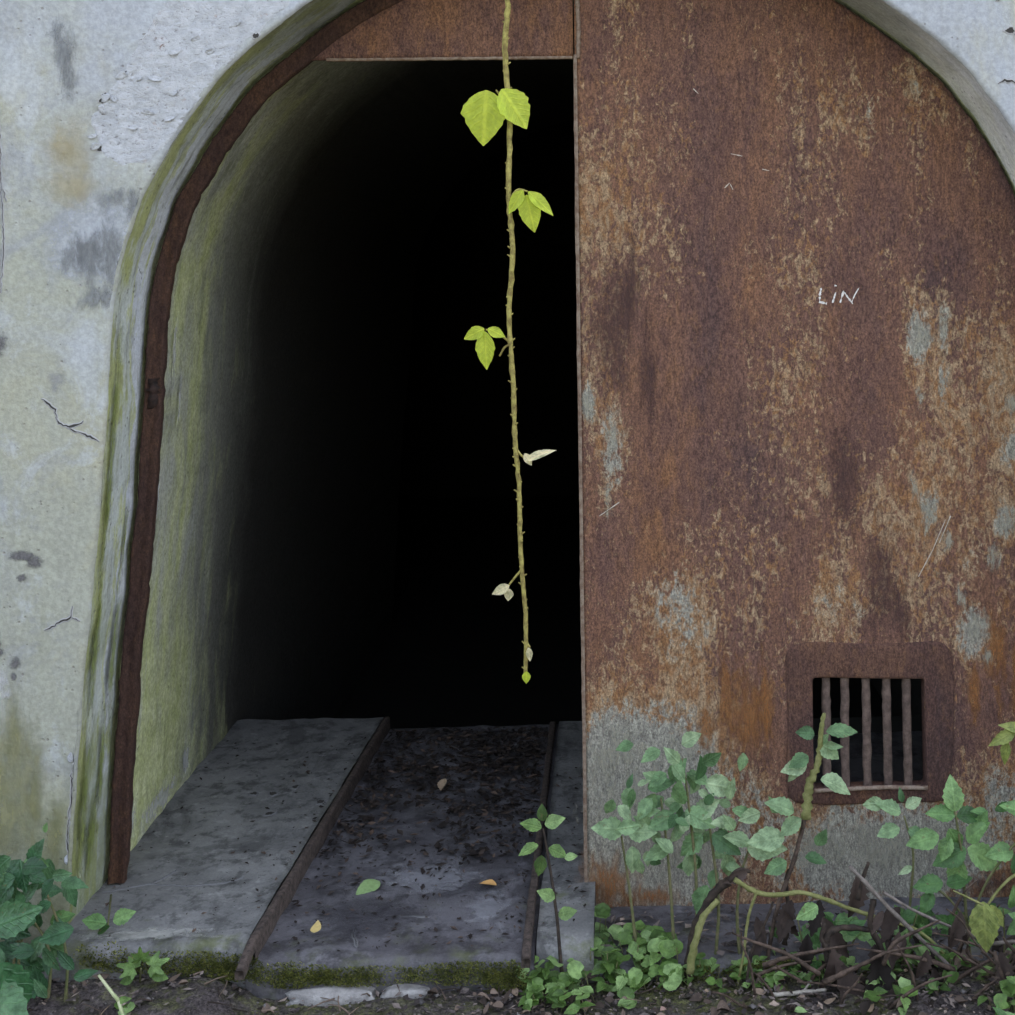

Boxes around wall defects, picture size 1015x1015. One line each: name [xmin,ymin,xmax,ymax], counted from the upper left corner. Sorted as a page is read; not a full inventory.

leakage [54,26,74,88]
spalling [87,0,290,166]
leakage [50,189,139,306]
crack [41,398,99,442]
leakage [10,551,40,582]
leakage [91,602,102,702]
rust [591,858,668,908]